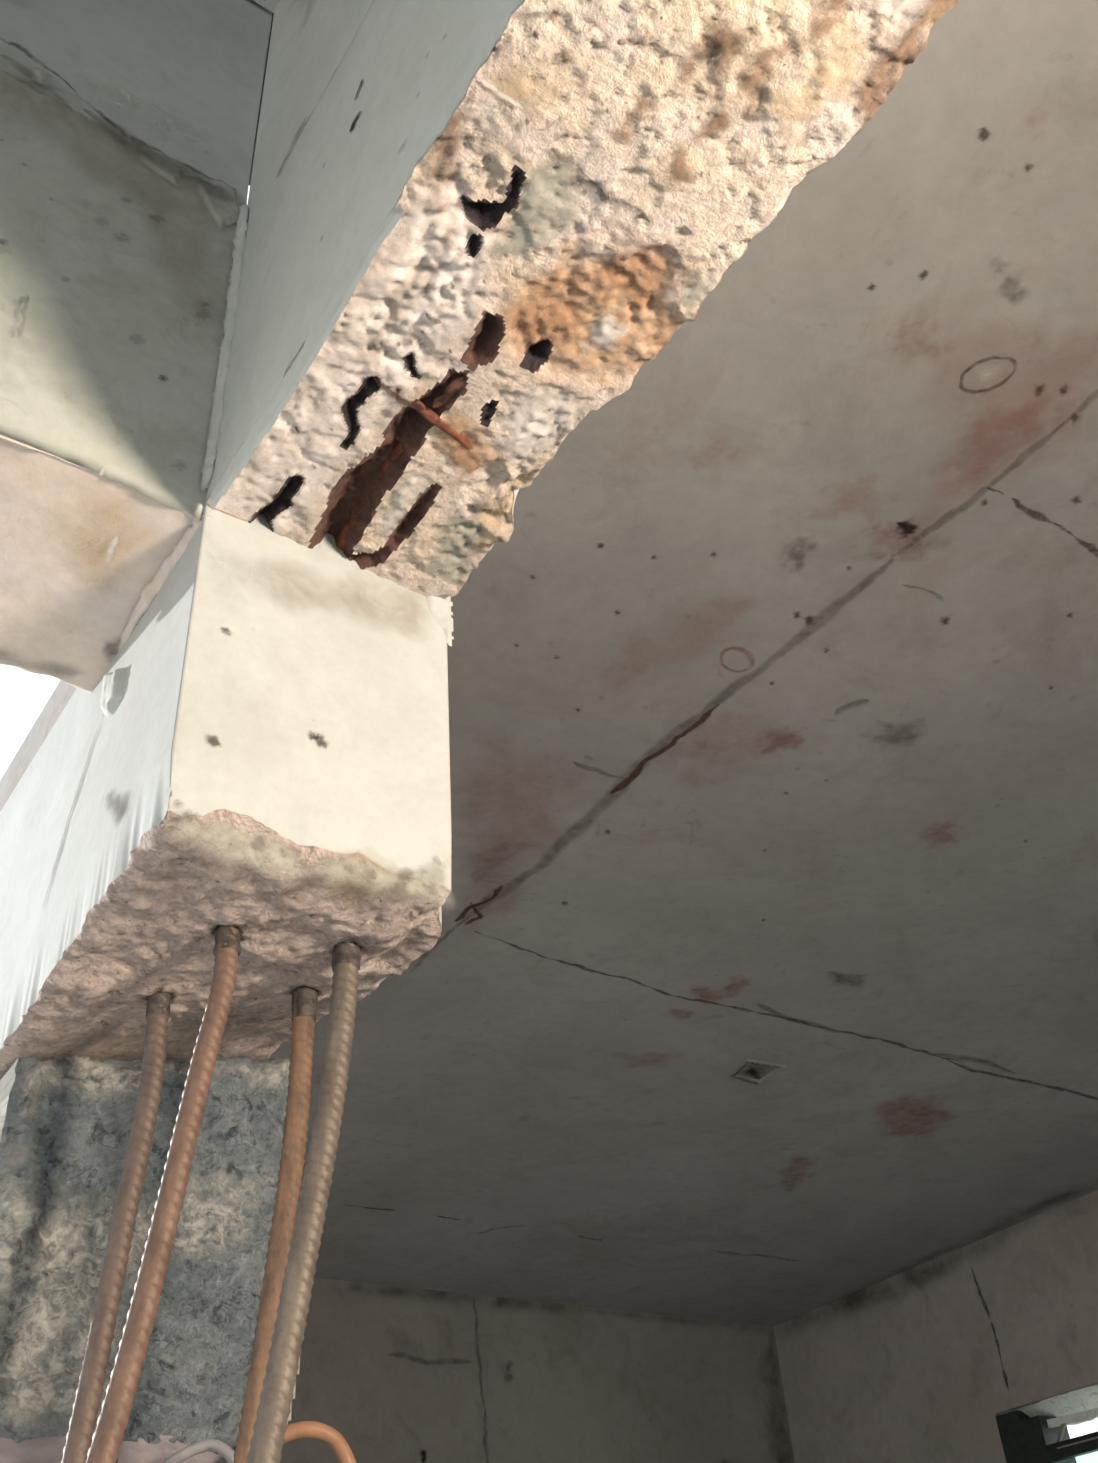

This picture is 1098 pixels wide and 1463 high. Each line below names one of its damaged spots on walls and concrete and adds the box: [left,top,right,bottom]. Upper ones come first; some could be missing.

spalling [114,163,582,656]
crack [374,377,465,410]
rust [438,415,493,471]
crack [987,487,1098,555]
crack [611,704,719,794]
spalling [0,809,451,1079]
crack [455,886,1097,1100]
crack [971,1267,1010,1395]